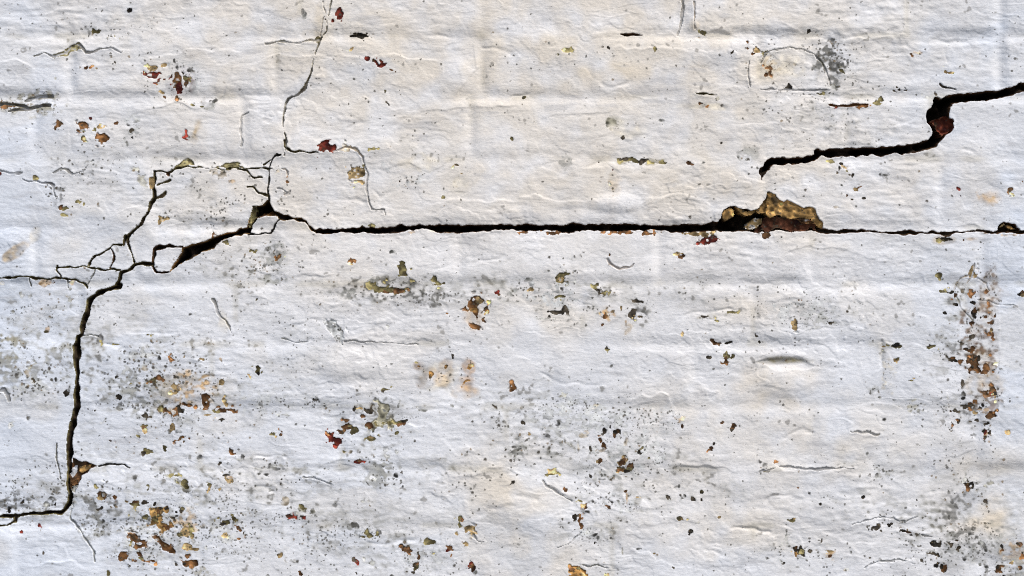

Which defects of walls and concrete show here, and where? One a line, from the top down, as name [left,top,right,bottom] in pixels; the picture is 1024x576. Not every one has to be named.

peeling [143,46,208,102]
crack [747,41,884,110]
crack [759,82,1024,179]
spalling [715,191,823,239]
crack [816,228,1024,237]
crack [0,0,720,562]
crack [953,259,990,292]
peeling [926,258,1024,443]
peeling [157,353,249,419]
peeling [325,386,408,464]
crack [759,460,854,473]
peeling [94,441,252,576]